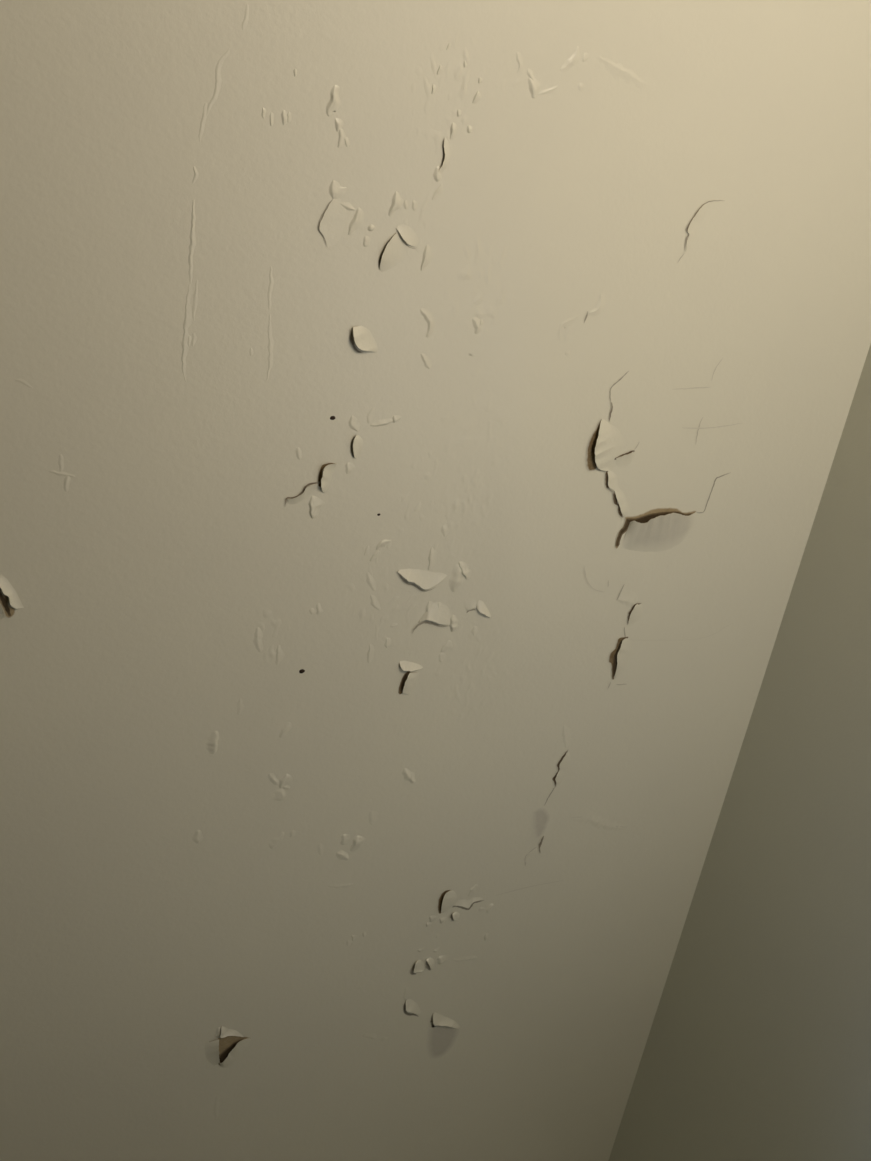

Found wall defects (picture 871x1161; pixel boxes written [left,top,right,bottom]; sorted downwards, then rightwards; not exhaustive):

peeling [317,180,433,272]
crack [677,200,725,263]
peeling [349,326,378,353]
peeling [285,407,402,519]
crack [586,371,731,552]
peeling [0,574,24,619]
peeling [397,547,472,634]
crack [583,565,741,689]
peeling [398,661,423,695]
crack [524,725,573,866]
peeling [403,884,495,1059]
peeling [205,1026,251,1068]